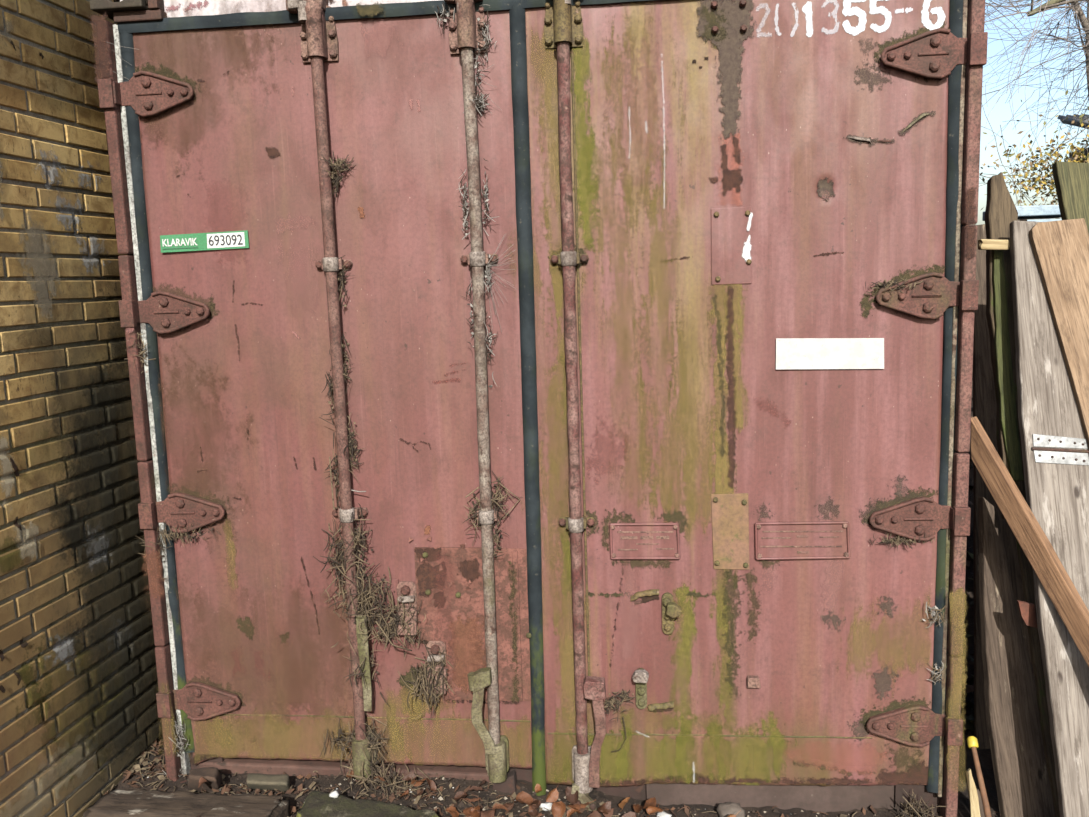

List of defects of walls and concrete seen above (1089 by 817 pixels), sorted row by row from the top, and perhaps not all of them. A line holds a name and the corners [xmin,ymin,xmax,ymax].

damp [0,437,39,559]